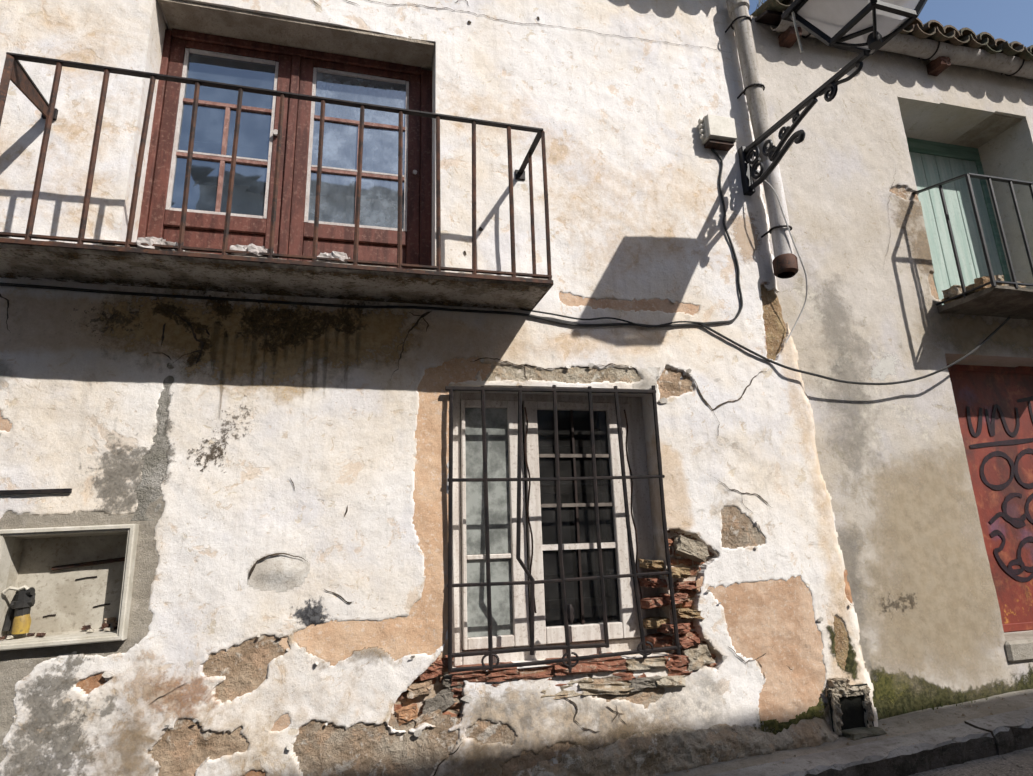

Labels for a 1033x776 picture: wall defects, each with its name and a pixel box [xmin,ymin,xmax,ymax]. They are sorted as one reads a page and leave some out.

water stain [0,248,548,399]
crack [391,311,431,377]
peeling [559,292,700,316]
flaking render [761,285,787,361]
water stain [80,394,175,516]
water stain [187,392,258,474]
flaking render [657,367,694,403]
crack [693,369,769,438]
flaking render [713,507,765,556]
peeling [696,576,849,723]
flaking render [578,675,665,709]
flaking render [271,713,575,776]